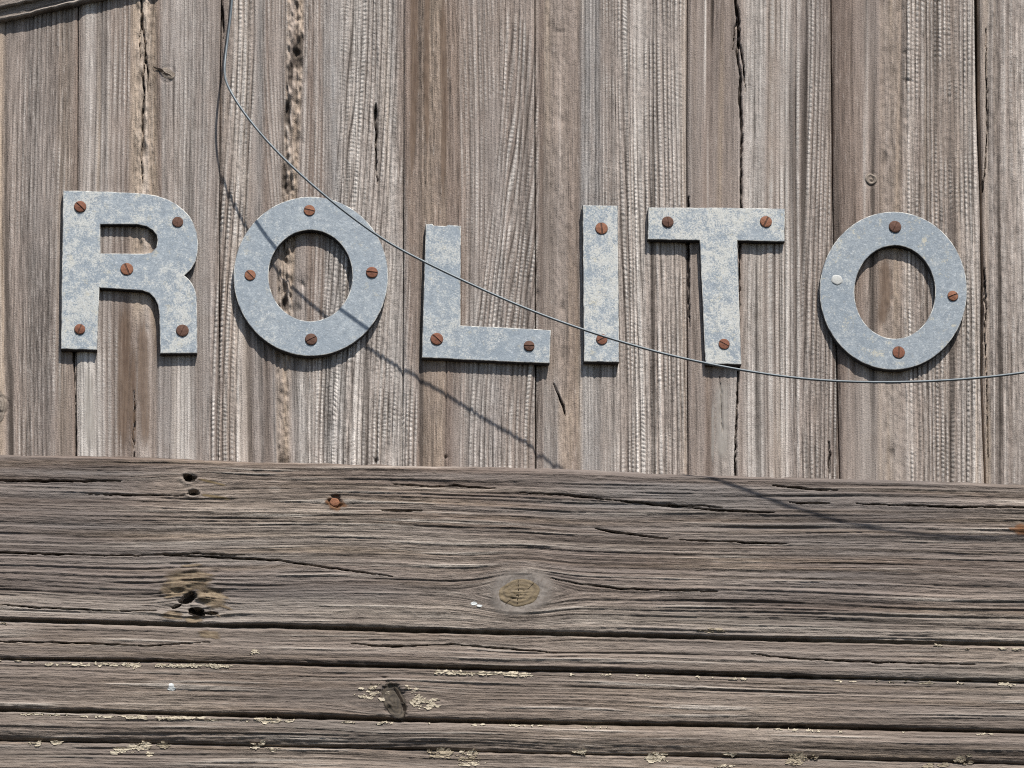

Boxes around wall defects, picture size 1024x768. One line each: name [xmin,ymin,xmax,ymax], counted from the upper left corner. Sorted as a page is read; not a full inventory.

crack [139,0,171,179]
crack [371,108,379,167]
crack [733,0,745,208]
crack [980,49,988,193]
crack [981,270,989,455]
crack [719,371,739,476]
crack [0,550,88,558]
crack [113,553,380,575]
crack [680,538,781,546]
crack [860,502,1024,510]